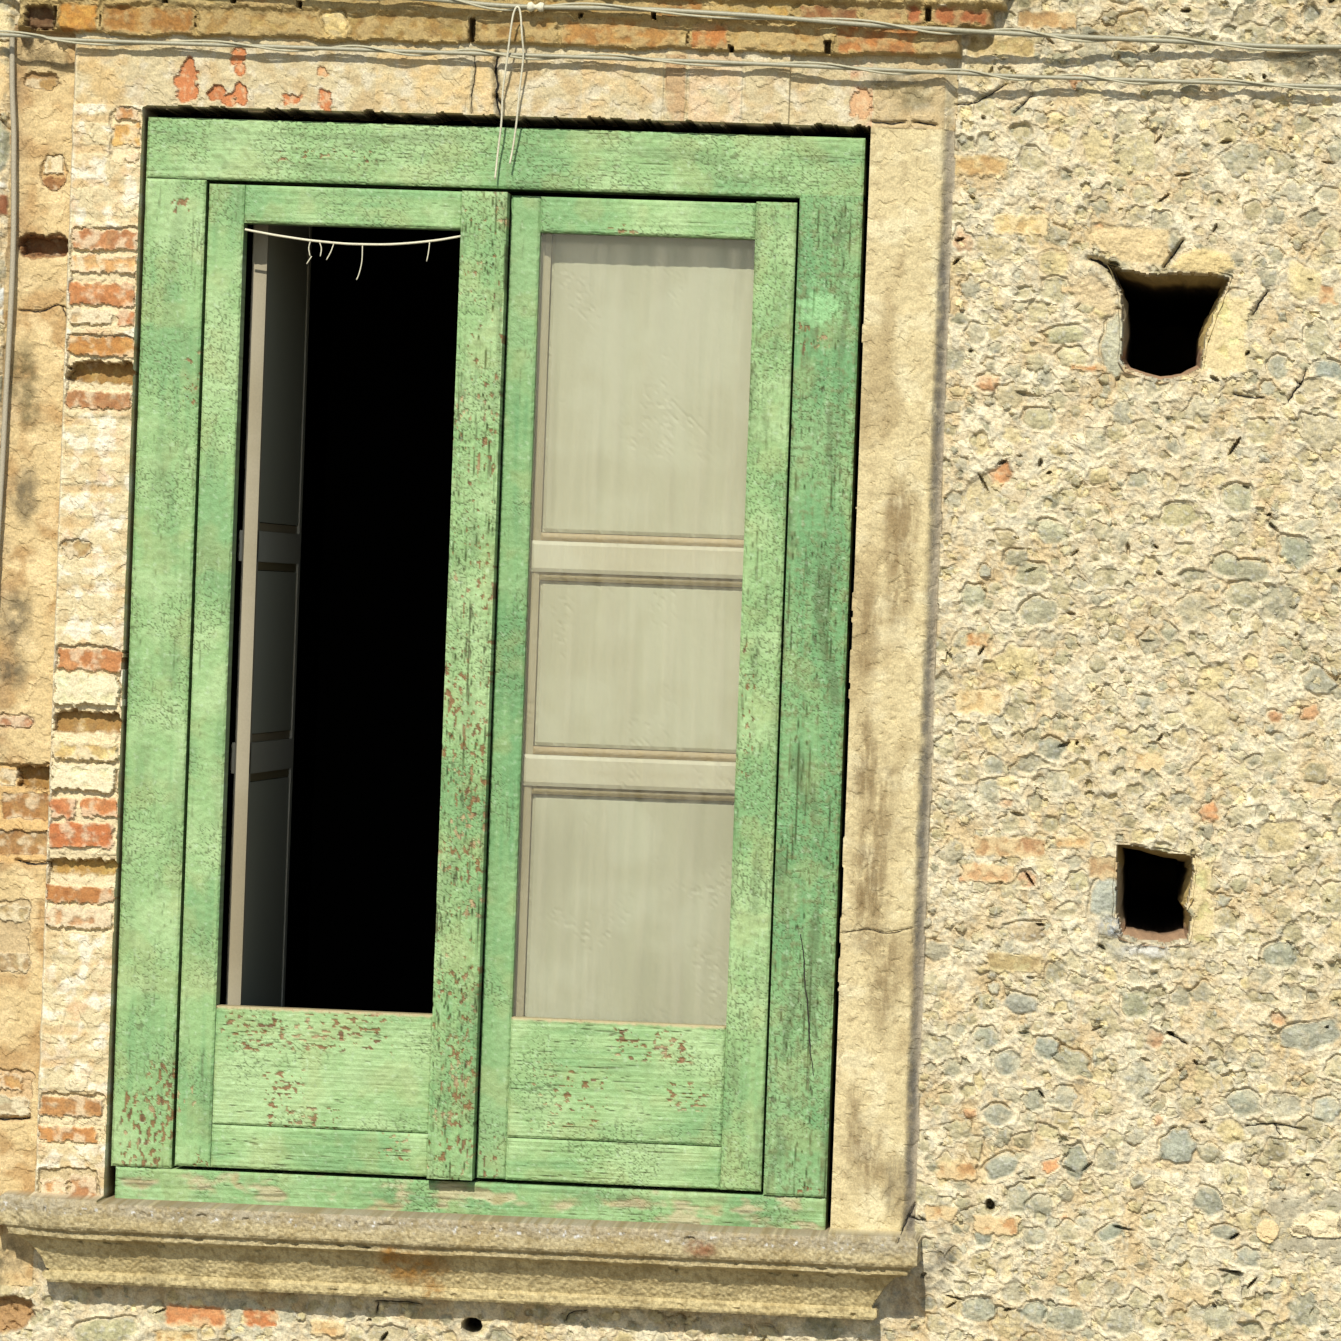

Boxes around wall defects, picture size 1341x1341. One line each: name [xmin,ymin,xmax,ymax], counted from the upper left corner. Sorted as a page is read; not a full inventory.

flaking render [174,48,247,106]
flaking render [283,94,302,105]
flaking render [318,67,332,111]
flaking render [19,226,144,411]
flaking render [61,539,92,559]
flaking render [0,644,129,975]
flaking render [38,1168,99,1195]